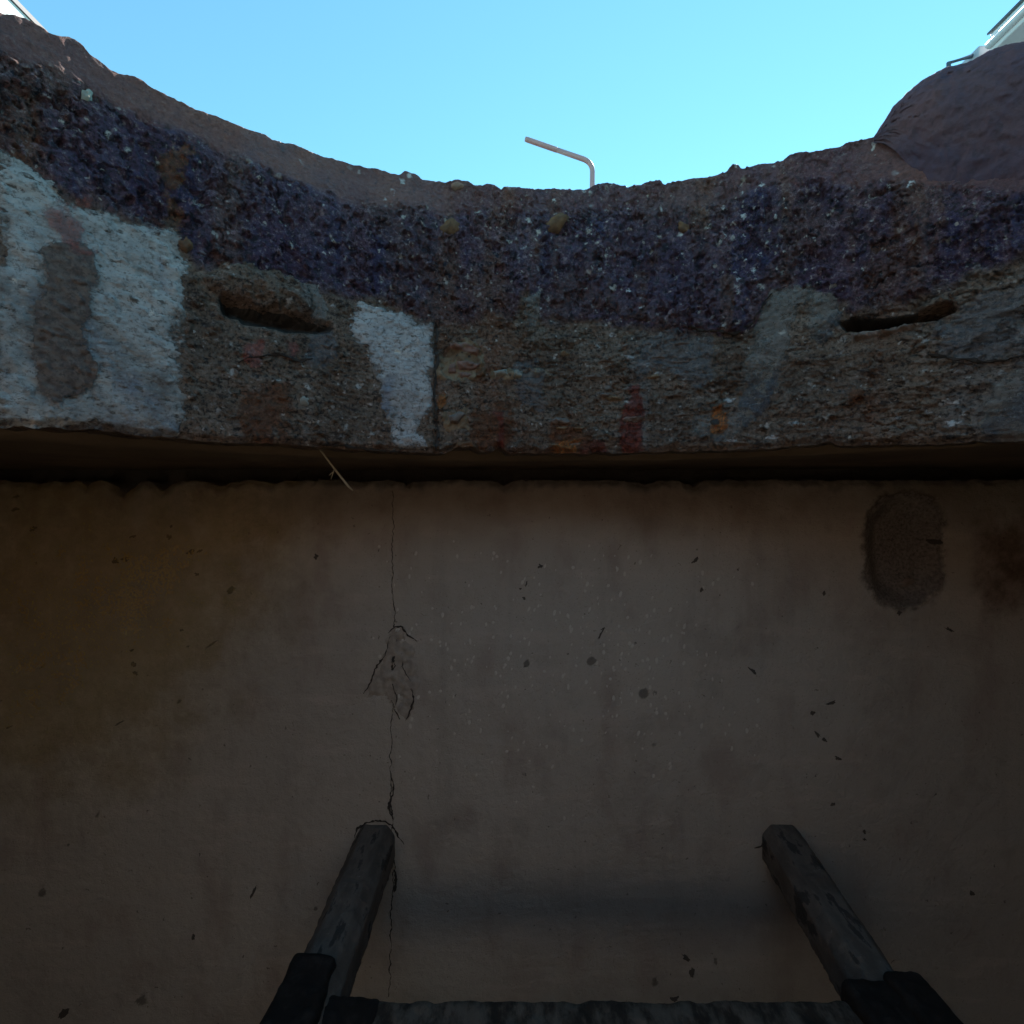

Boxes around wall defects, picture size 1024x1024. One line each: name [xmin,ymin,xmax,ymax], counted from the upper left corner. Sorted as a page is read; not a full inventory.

spalling [219,283,334,335]
peeling [737,284,921,428]
crack [390,492,398,670]
crack [354,700,404,997]